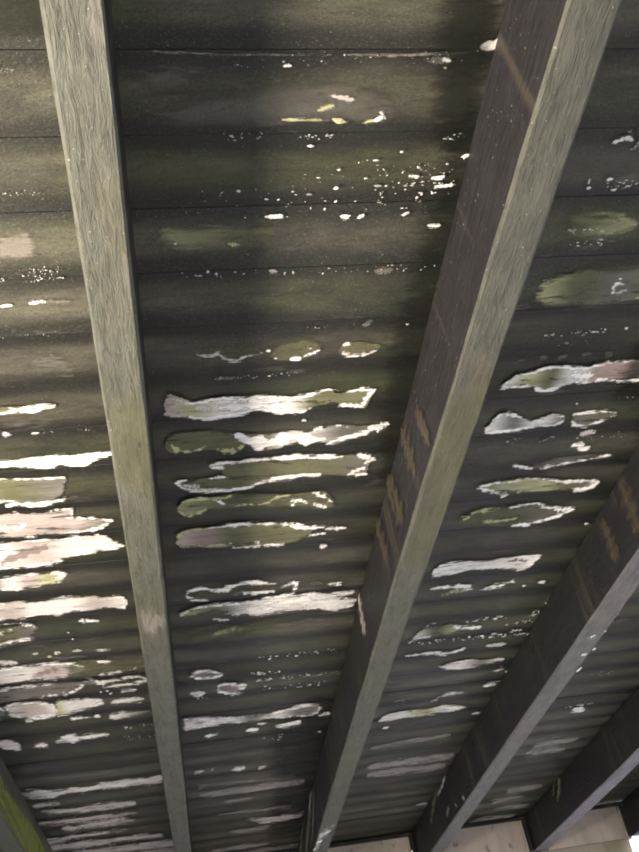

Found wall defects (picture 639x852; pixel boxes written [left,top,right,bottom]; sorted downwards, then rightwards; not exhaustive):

water stain [0,0,44,38]
water stain [379,0,498,479]
peeling [501,360,639,392]
water stain [615,349,639,401]
peeling [163,387,376,422]
peeling [164,421,389,517]
peeling [477,403,620,498]
peeling [0,452,125,591]
peeling [0,596,127,648]
peeling [180,580,357,621]
peeling [431,554,542,596]
peeling [0,649,155,740]